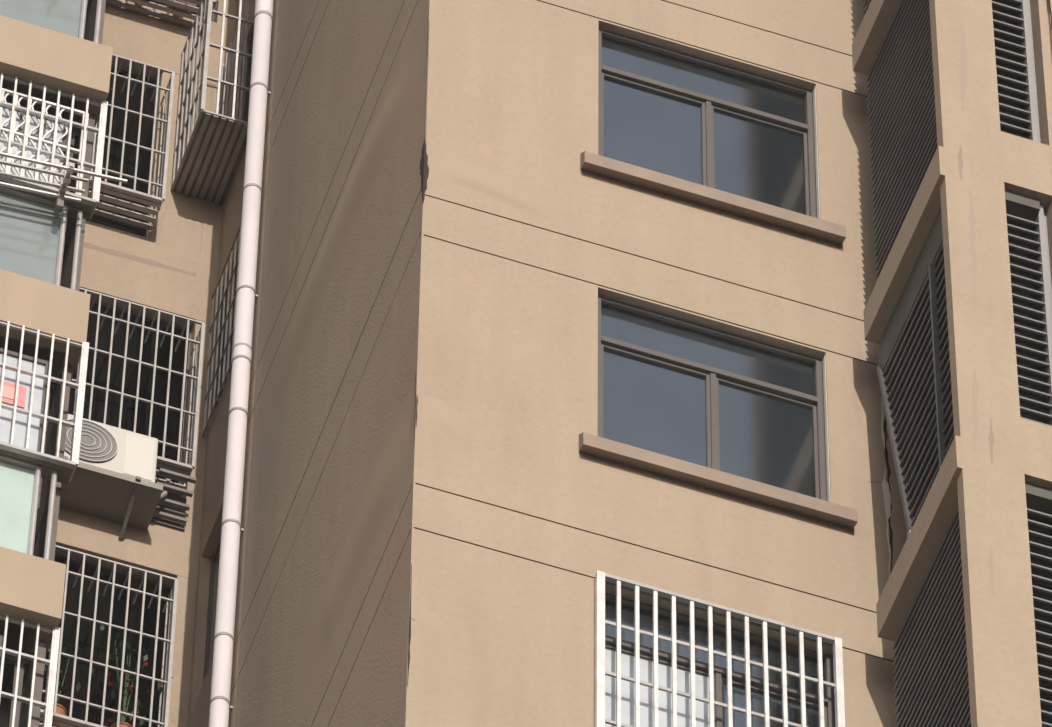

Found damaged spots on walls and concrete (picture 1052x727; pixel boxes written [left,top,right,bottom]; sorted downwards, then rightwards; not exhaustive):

crack [868,415,893,572]